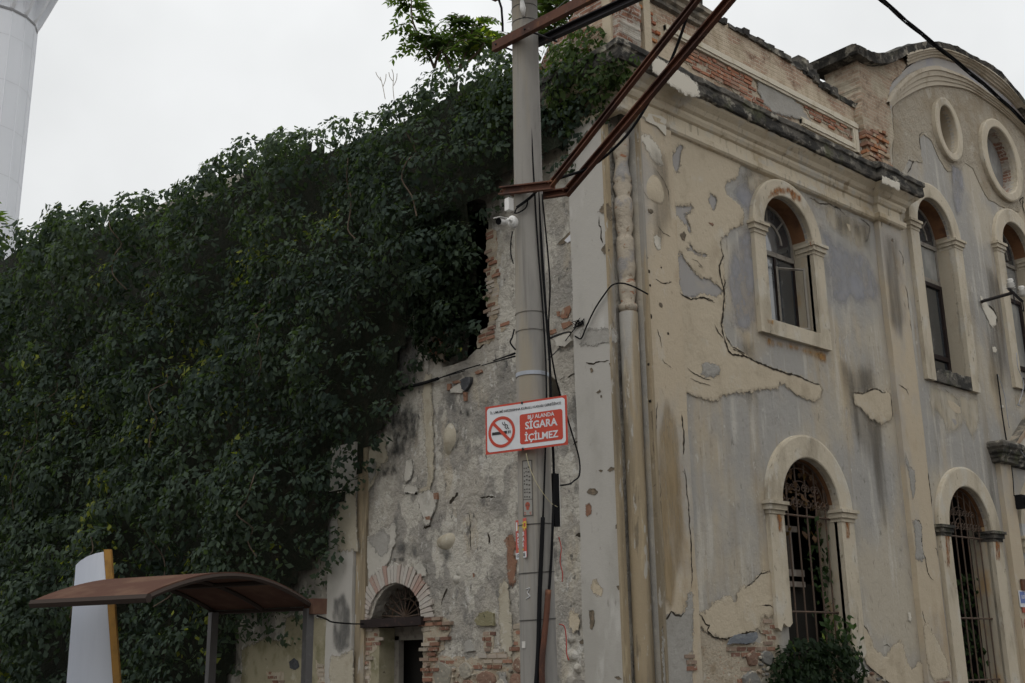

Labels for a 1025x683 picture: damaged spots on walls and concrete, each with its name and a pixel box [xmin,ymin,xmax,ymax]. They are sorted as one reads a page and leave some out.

flaking render [803,105,853,139]
peeling [638,113,824,402]
crack [656,241,823,395]
spalling [504,534,518,587]
spalling [661,570,776,683]